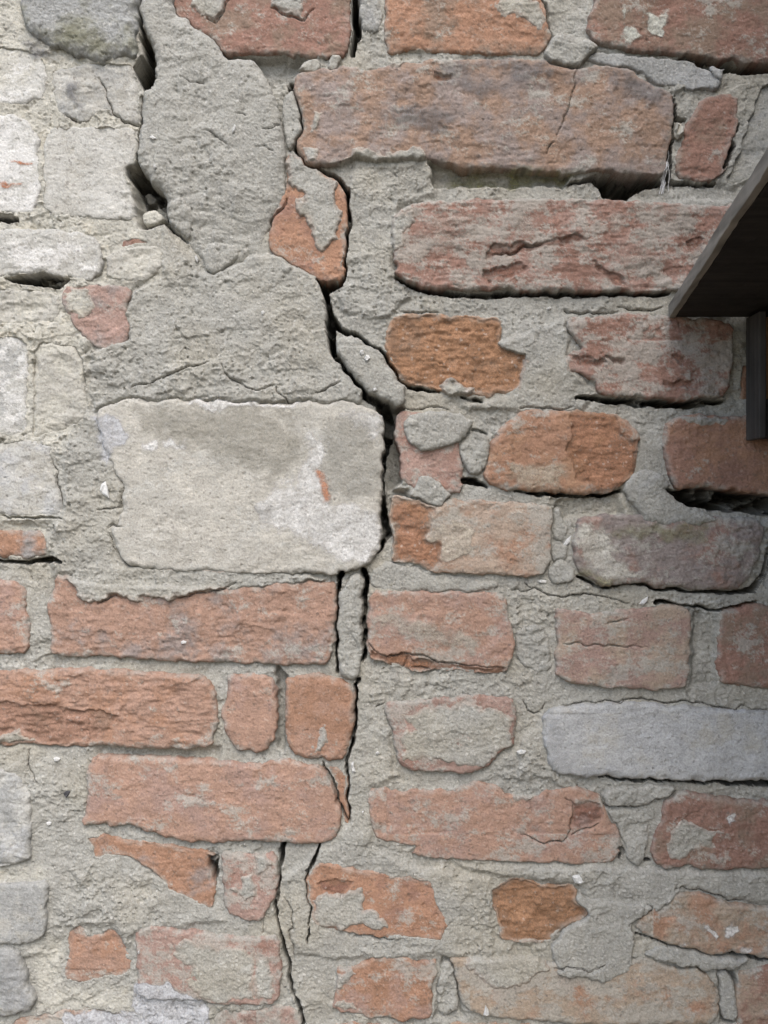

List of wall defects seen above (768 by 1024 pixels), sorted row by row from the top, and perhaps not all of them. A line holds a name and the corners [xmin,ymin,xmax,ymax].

crack [140,28,157,91]
crack [132,159,183,240]
crack [142,361,289,404]
crack [317,173,492,818]
crack [263,842,321,1024]